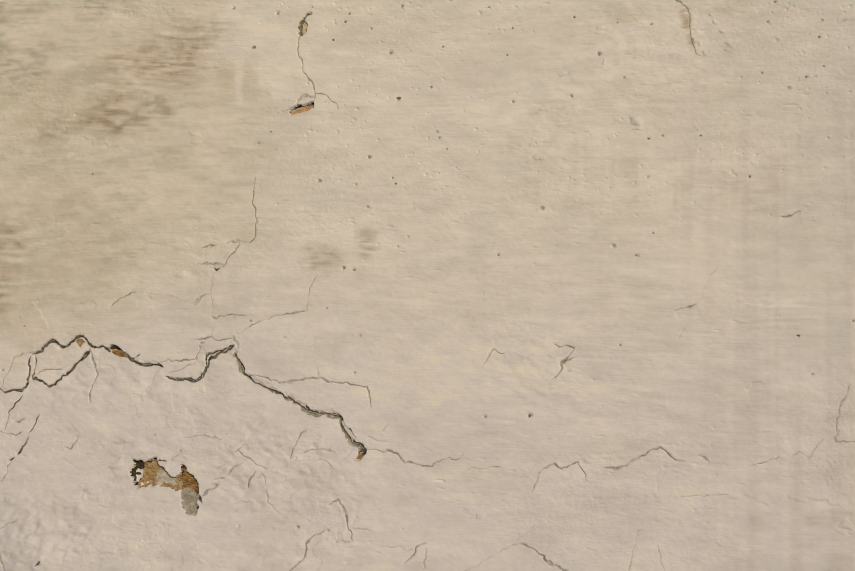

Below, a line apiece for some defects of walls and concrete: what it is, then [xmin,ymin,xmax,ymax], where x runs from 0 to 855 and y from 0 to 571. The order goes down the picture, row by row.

spalling [298,20,308,37]
spalling [289,101,314,116]
crack [0,181,503,483]
spalling [130,457,199,516]
crack [158,430,278,512]
crack [532,447,708,493]
crack [289,499,427,571]
crack [465,525,567,571]